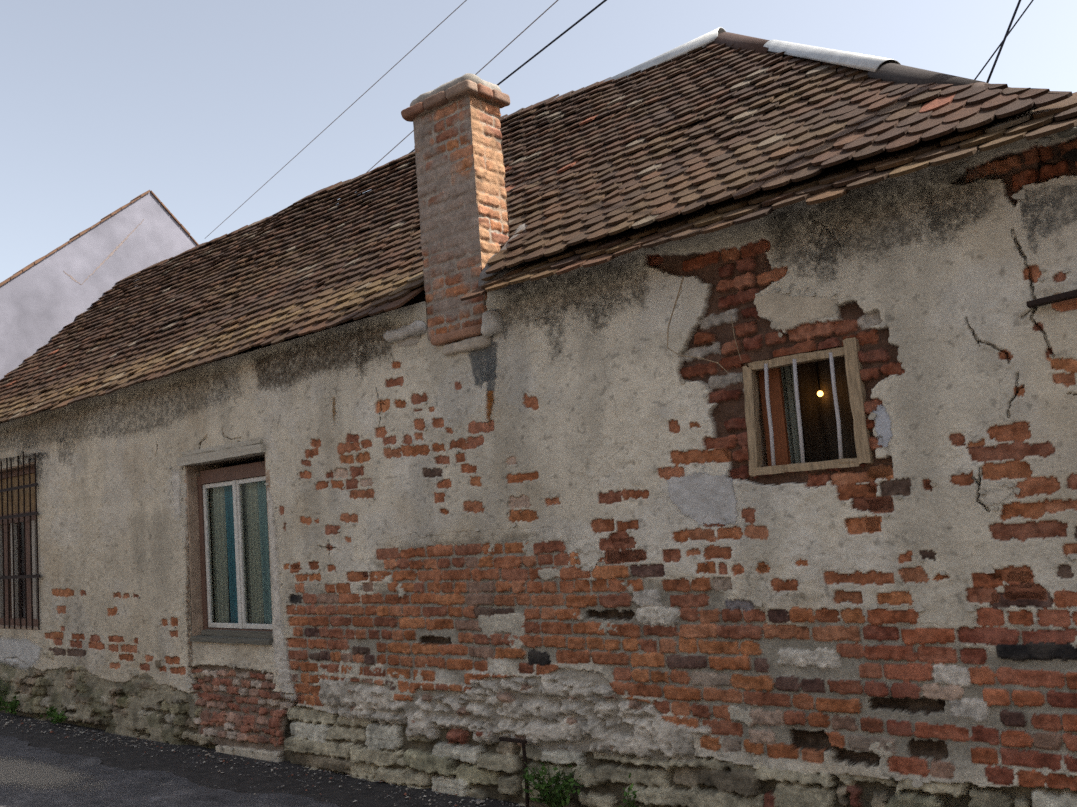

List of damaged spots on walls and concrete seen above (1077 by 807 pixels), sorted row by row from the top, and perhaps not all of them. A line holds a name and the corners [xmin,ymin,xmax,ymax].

spalling [957,138,1077,206]
crack [1011,229,1054,356]
spalling [1024,266,1070,283]
spalling [1052,298,1077,311]
spalling [387,362,404,387]
spalling [524,394,539,410]
spalling [645,239,911,534]
crack [966,318,1024,418]
spalling [1046,348,1077,387]
spalling [296,393,495,514]
spalling [0,422,1077,791]